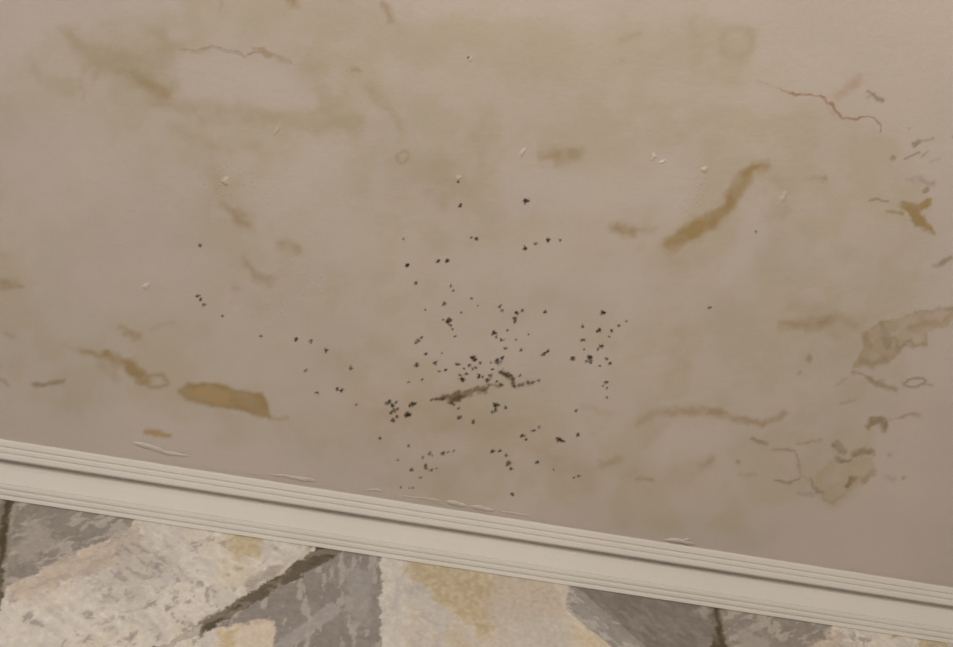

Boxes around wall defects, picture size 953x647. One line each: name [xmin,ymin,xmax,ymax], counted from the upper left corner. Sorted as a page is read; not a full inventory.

crack [179,44,294,66]
leakage [18,0,760,147]
leakage [141,91,325,160]
leakage [378,101,506,206]
crack [754,78,883,134]
leakage [655,156,777,278]
peeling [867,173,937,237]
leakage [58,340,173,392]
leakage [174,379,291,423]
leakage [429,372,505,407]
leakage [337,382,605,503]
leakage [597,449,721,502]